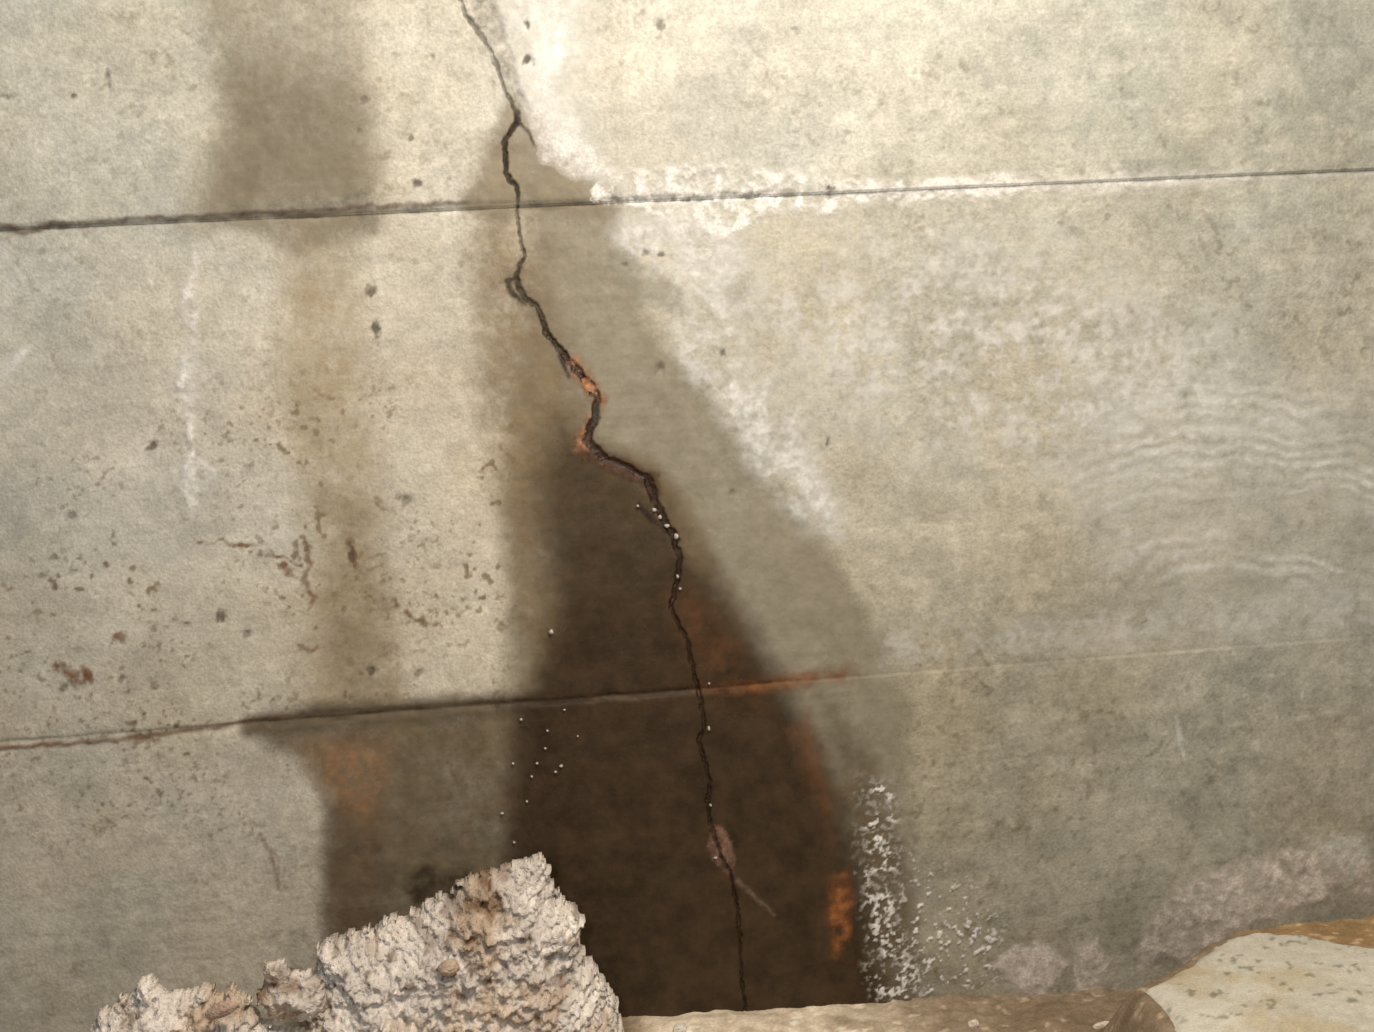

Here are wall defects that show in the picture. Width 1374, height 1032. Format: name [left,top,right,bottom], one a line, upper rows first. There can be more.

water stain [209,52,369,217]
crack [0,221,86,234]
crack [121,215,181,223]
crack [231,201,472,216]
crack [495,64,705,763]
water stain [930,271,1333,495]
water stain [247,0,1208,1017]
crack [0,733,165,750]
crack [199,714,300,728]
crack [705,799,745,1011]
rust [830,875,851,949]